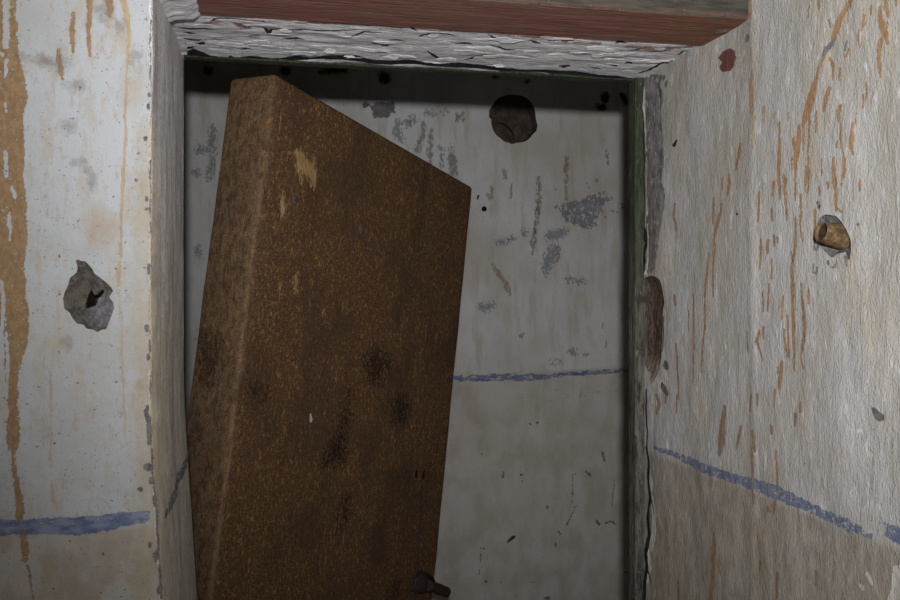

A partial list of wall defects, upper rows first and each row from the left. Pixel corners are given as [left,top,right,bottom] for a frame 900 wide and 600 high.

corrosion [56,11,76,80]
peeling [195,18,265,29]
flaking render [187,21,417,60]
flaking render [420,28,693,67]
corrosion [0,0,34,600]
spalling [63,260,114,332]
peeling [554,180,624,229]
corrosion [688,142,742,383]
corrosion [757,0,897,407]
spalling [813,201,851,275]
corrosion [718,405,726,455]
crack [642,389,654,600]